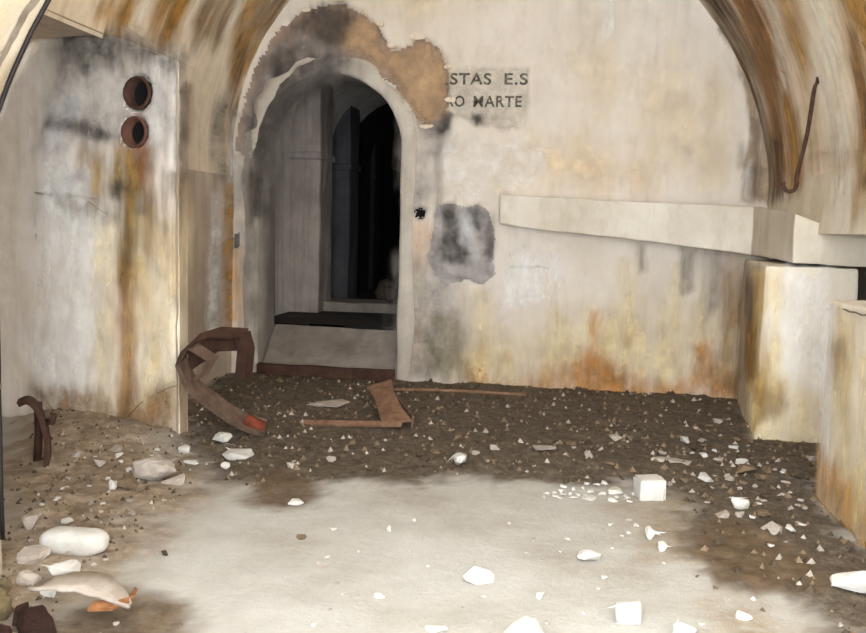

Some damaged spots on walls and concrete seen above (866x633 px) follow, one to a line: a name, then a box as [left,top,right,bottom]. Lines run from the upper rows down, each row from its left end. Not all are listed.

leakage [46,104,108,142]
leakage [63,0,188,71]
flaking render [235,0,456,155]
leakage [706,0,802,202]
leakage [780,0,806,73]
leakage [845,0,866,207]
leakage [35,133,169,425]